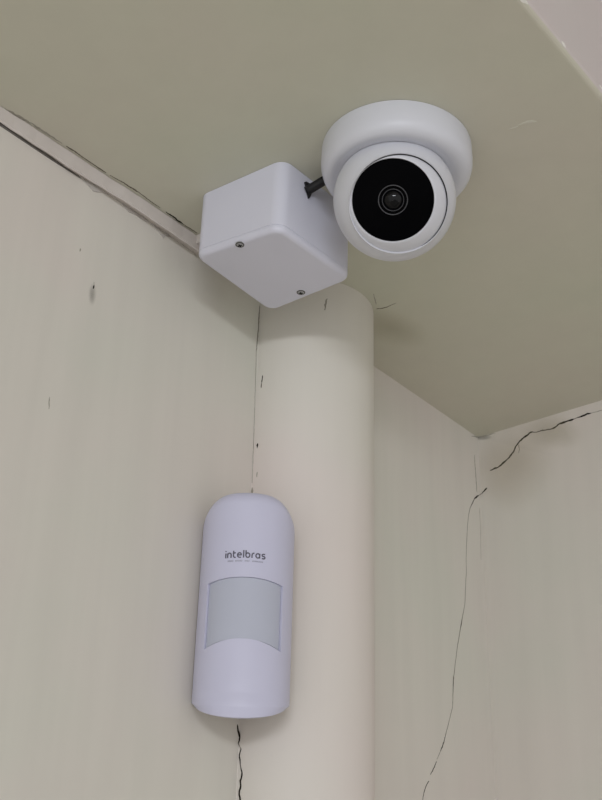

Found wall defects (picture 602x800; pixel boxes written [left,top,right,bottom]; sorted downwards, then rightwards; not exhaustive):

crack [4,108,197,233]
crack [423,410,602,796]